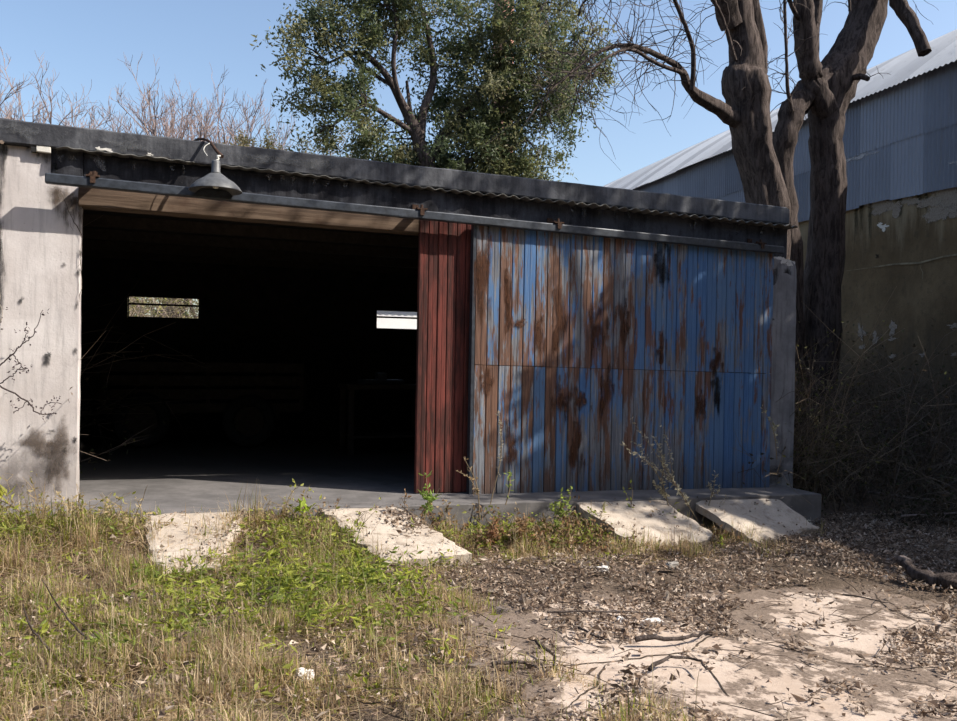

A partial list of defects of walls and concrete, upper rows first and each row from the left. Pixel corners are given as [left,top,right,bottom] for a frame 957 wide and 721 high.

leakage [0,144,8,205]
peeling [865,187,957,232]
corrosion [474,243,490,326]
corrosion [504,269,569,355]
corrosion [590,293,630,352]
corrosion [655,243,671,287]
corrosion [696,347,724,419]
leakage [22,426,69,488]
corrosion [505,419,521,468]
corrosion [552,363,615,469]